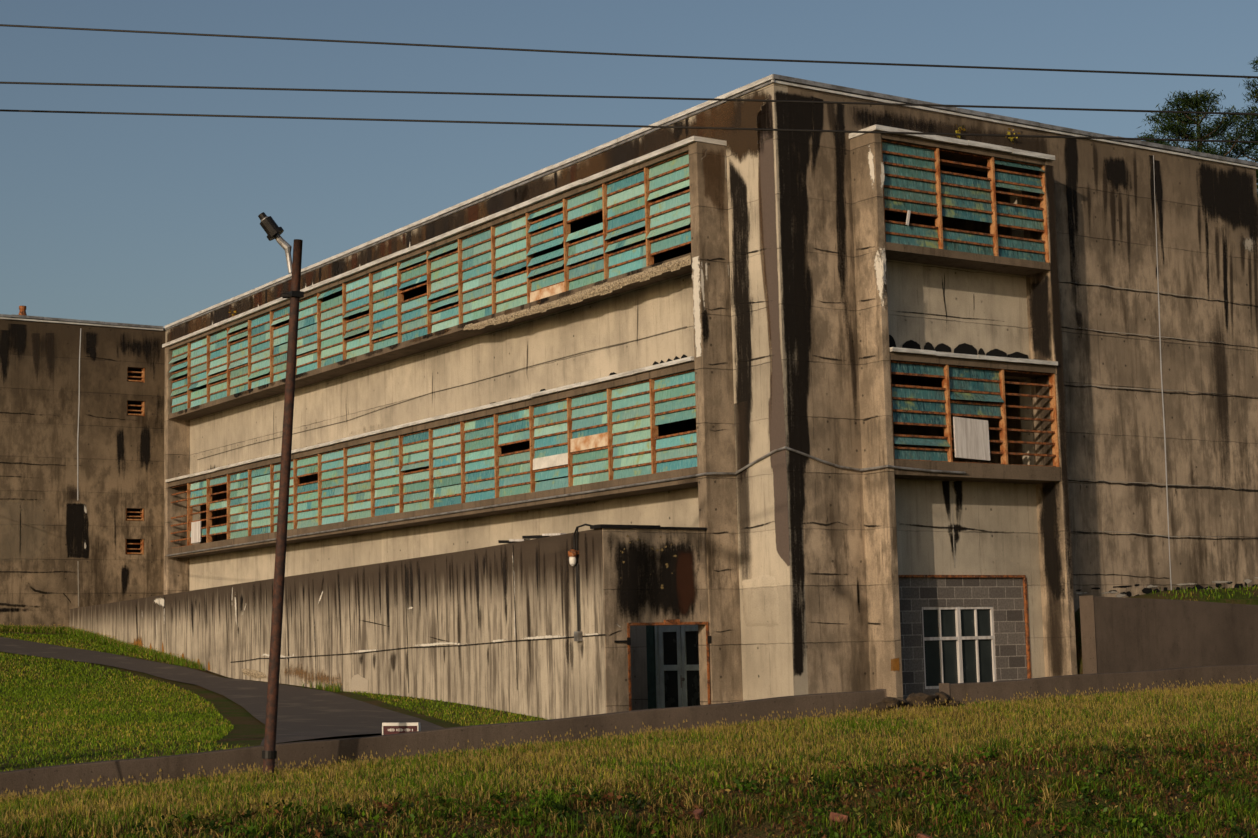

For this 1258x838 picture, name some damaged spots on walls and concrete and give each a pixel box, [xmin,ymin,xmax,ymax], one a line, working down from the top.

damp [0,324,54,381]
damp [86,332,97,361]
damp [117,90,1164,676]
damp [1196,163,1258,464]